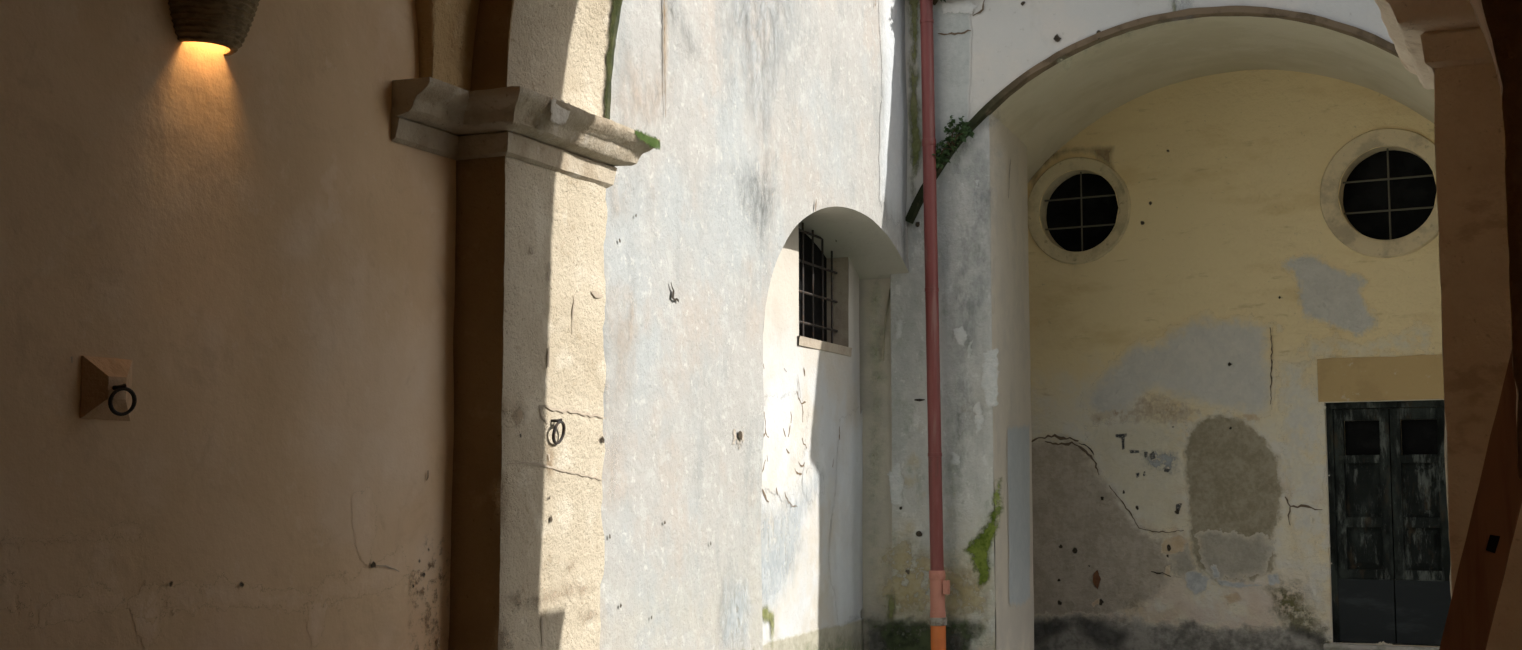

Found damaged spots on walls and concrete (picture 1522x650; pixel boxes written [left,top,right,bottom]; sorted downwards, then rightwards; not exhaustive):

flaking render [953,326,1000,435]
damp [761,408,875,626]
flaking render [887,462,905,510]
spalling [1007,350,1332,616]
damp [882,541,985,613]
damp [1034,611,1326,650]